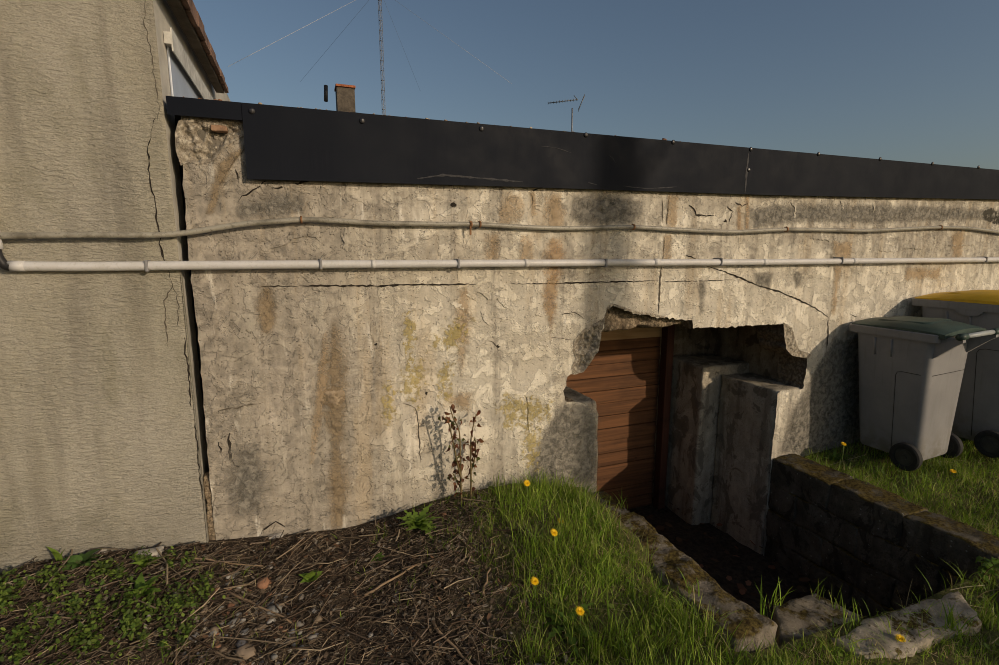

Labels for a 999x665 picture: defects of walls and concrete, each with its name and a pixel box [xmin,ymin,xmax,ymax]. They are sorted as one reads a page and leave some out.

spalling [175,116,244,165]
crack [143,0,263,494]
crack [512,196,829,350]
damp [258,289,275,333]
spalling [572,304,665,374]
spalling [783,322,811,358]
damp [313,327,346,527]